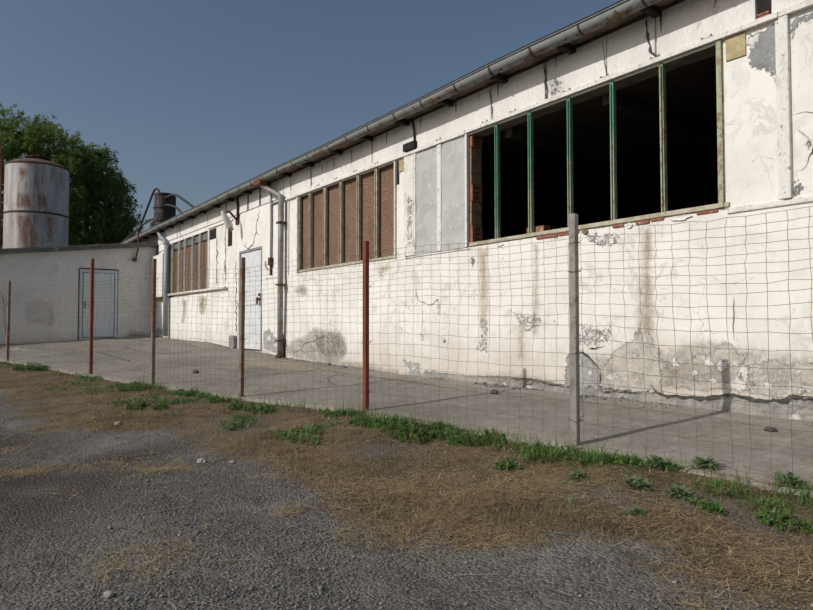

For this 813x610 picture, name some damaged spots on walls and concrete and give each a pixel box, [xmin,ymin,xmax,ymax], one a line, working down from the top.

crack [645,19,657,57]
spalling [747,23,776,82]
spalling [790,12,813,39]
crack [794,107,813,169]
crack [216,214,259,331]
leakage [639,232,651,334]
peeling [514,312,541,331]
spalling [564,323,813,399]
crack [580,346,813,403]